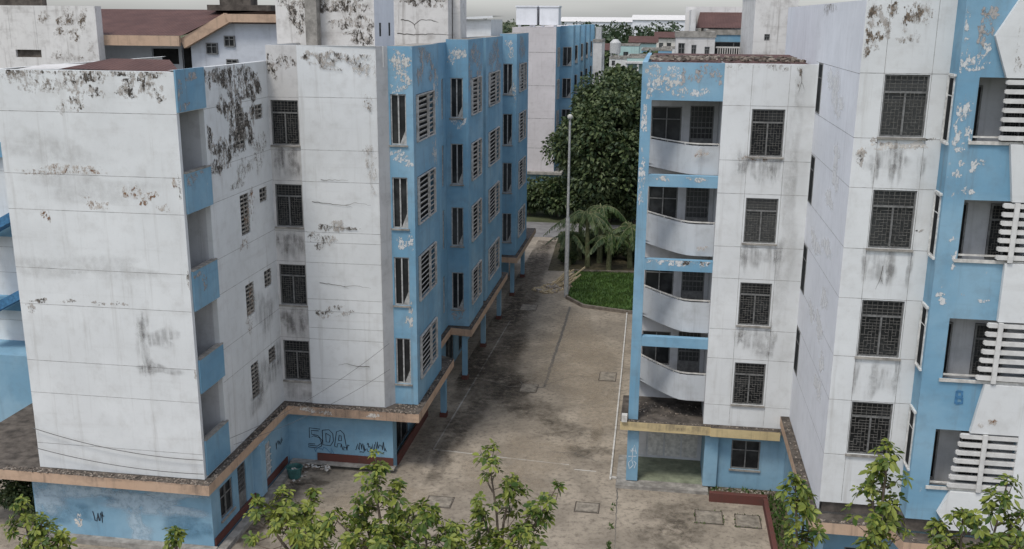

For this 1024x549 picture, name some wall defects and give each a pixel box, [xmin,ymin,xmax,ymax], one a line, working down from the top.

mould [865,2,933,57]
peeling [959,6,1000,73]
mould [1,51,166,112]
mould [204,0,374,189]
peeling [389,47,438,104]
peeling [641,63,722,132]
crack [312,179,359,231]
peeling [638,147,669,205]